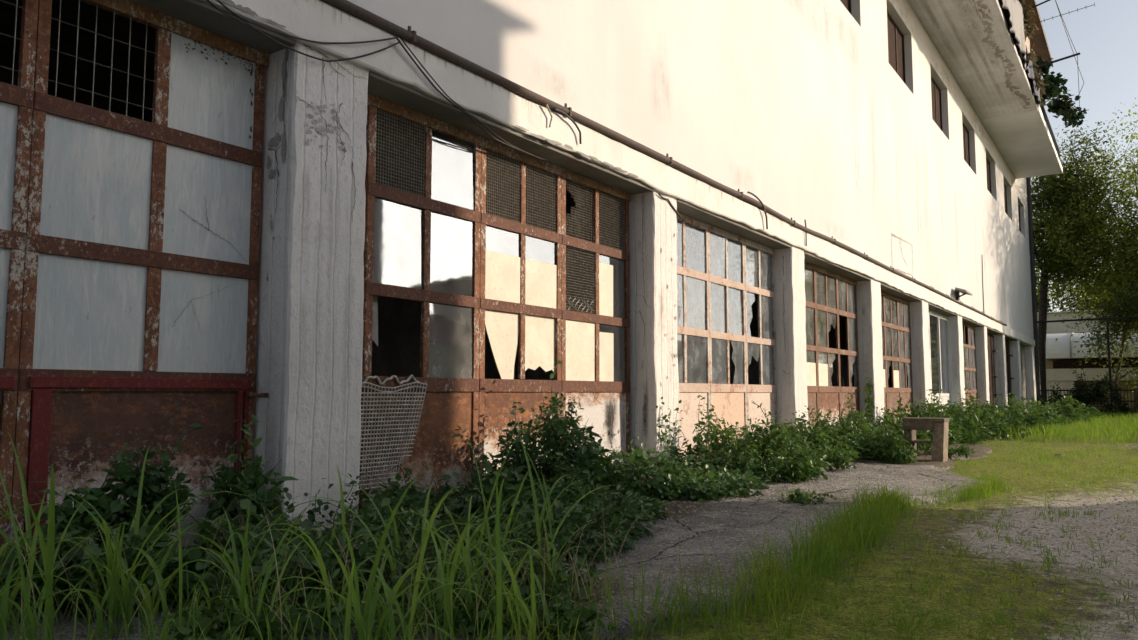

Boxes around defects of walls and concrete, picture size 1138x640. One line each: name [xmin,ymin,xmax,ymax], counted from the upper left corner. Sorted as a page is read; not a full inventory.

crack [268,44,365,220]
crack [172,199,246,335]